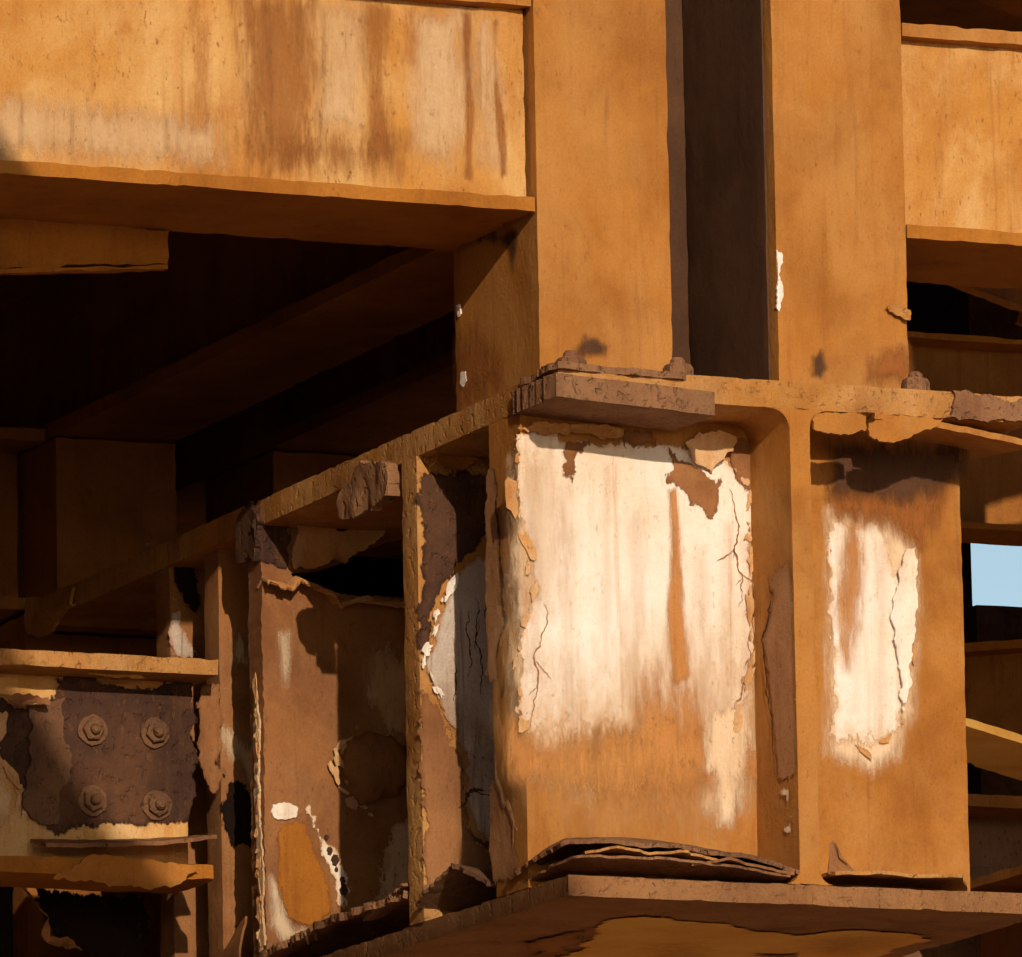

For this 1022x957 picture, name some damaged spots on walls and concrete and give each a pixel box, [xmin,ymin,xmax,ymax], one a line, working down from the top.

rust [244,0,352,166]
rust [368,6,394,161]
rust [495,85,506,176]
crack [717,490,753,605]
peeling [0,361,799,957]
peeling [824,505,919,769]
crack [458,787,490,809]
crack [471,834,490,850]